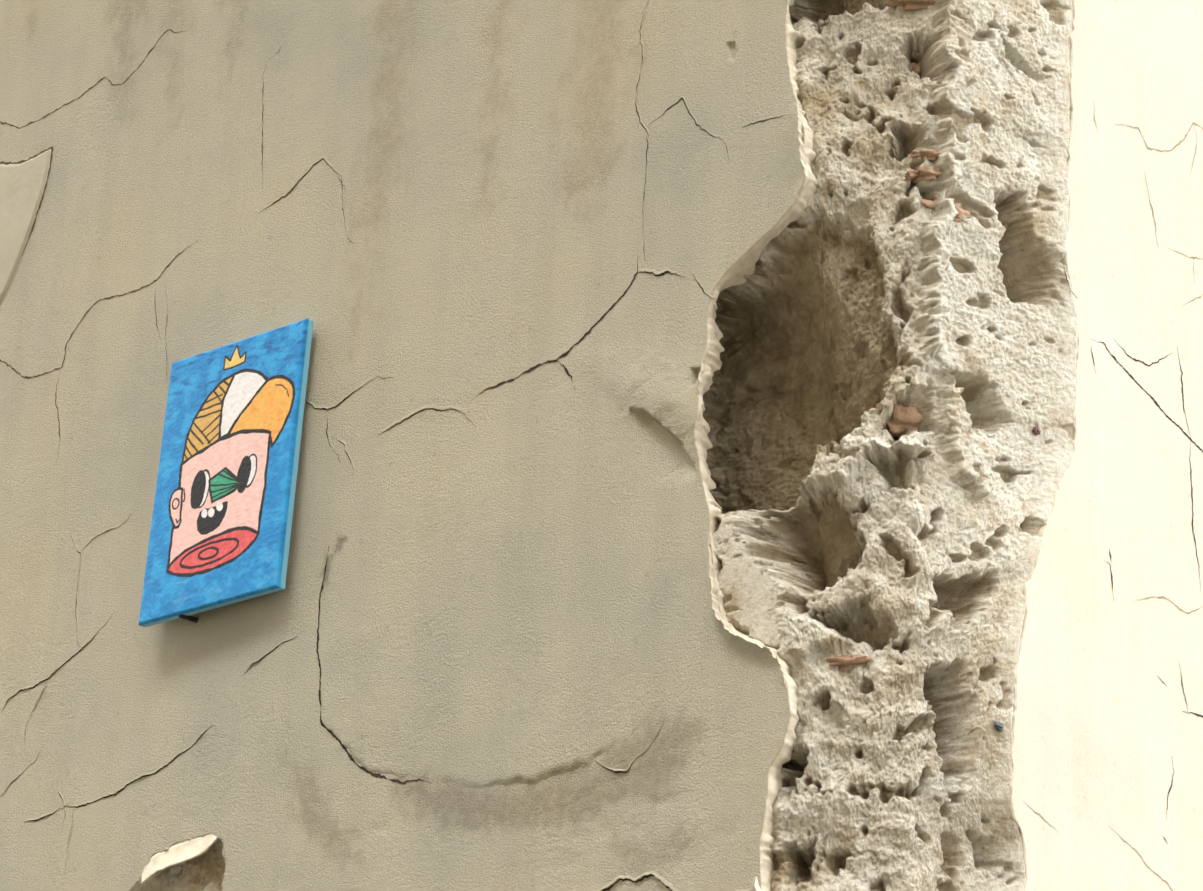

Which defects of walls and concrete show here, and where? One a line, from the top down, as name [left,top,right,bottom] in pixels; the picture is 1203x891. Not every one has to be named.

crack [0,29,184,129]
crack [0,147,53,256]
crack [0,241,197,463]
crack [378,0,784,435]
peeling [636,268,686,277]
spalling [693,0,1078,891]
crack [1091,338,1203,614]
crack [1094,106,1203,307]
crack [0,512,133,795]
crack [24,723,213,875]
flaking render [128,834,226,891]
peeling [597,871,678,891]